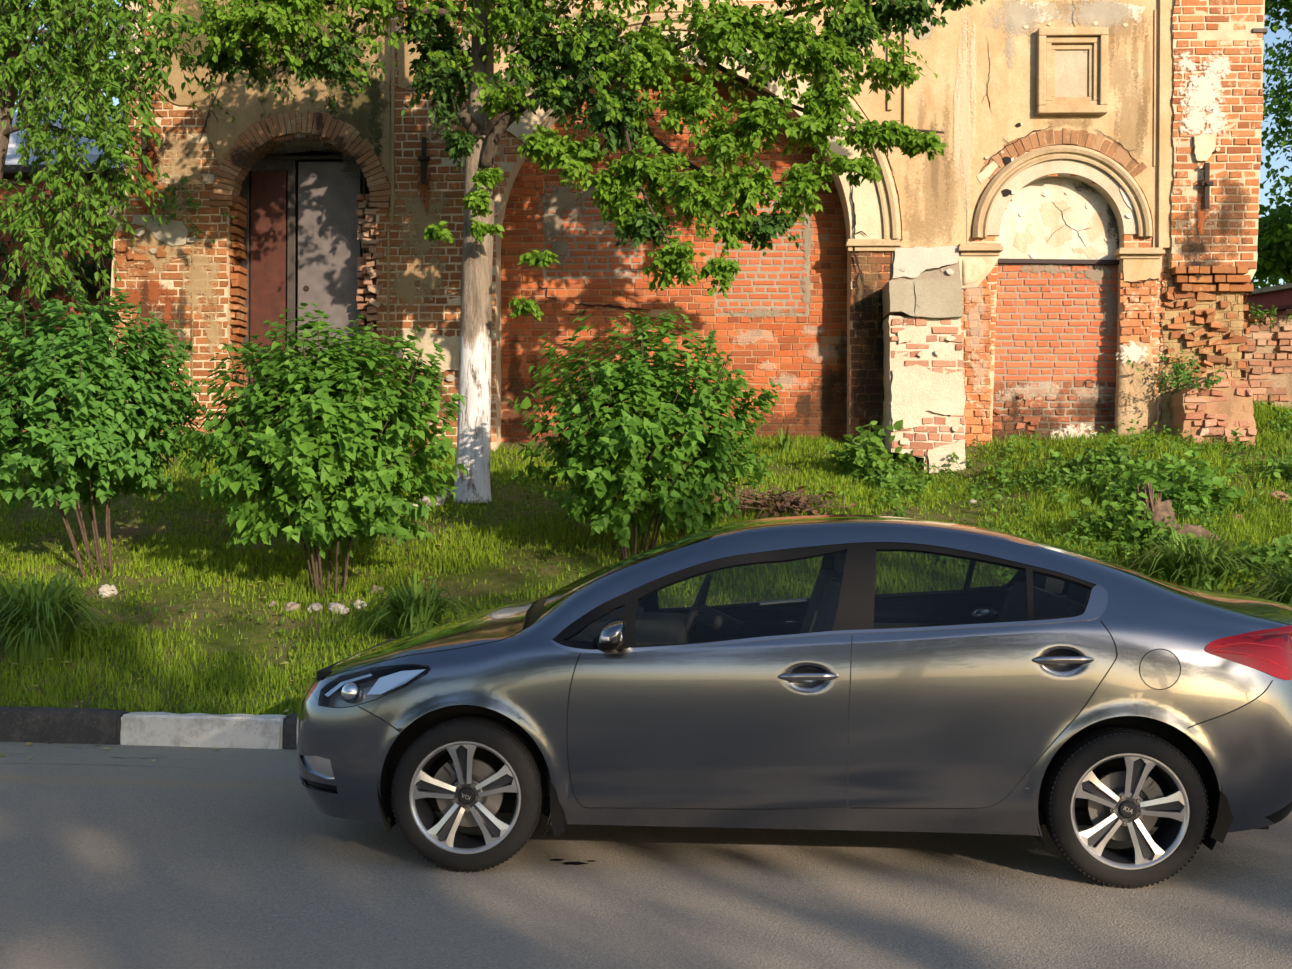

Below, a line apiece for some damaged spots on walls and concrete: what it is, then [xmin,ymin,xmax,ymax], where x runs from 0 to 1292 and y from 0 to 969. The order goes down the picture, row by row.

peeling [114,215,198,277]
peeling [892,246,959,279]
crack [1046,202,1093,247]
damp [1176,178,1250,280]
crack [538,281,655,319]
spalling [1163,292,1235,377]
peeling [890,328,966,473]